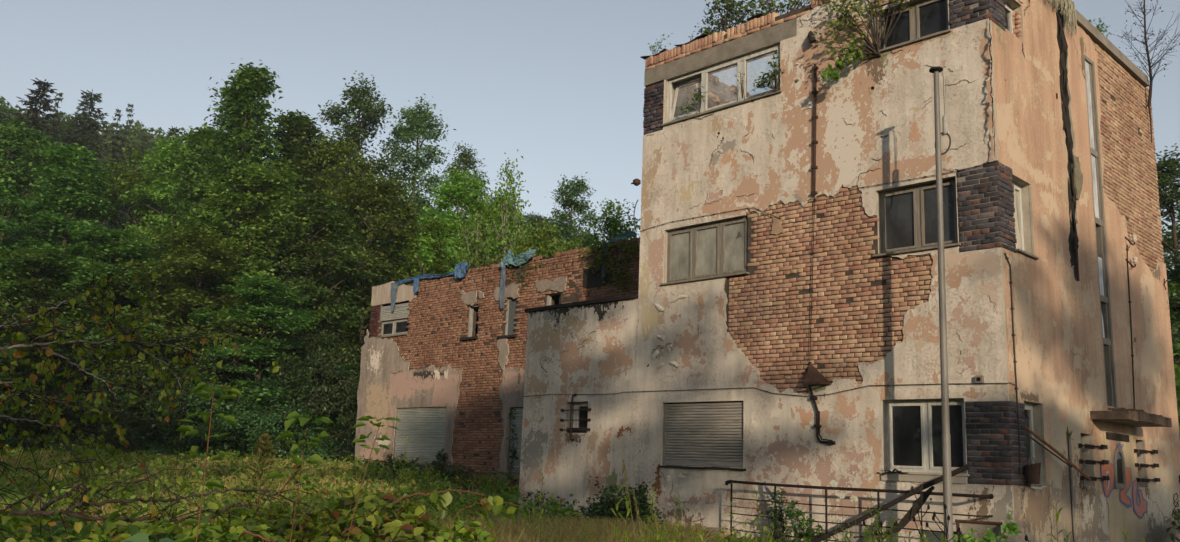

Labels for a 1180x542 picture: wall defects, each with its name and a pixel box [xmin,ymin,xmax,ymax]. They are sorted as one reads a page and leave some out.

crack [890,0,1030,154]
flaking render [644,14,1006,519]
peeling [358,369,459,465]
peeling [502,313,633,500]